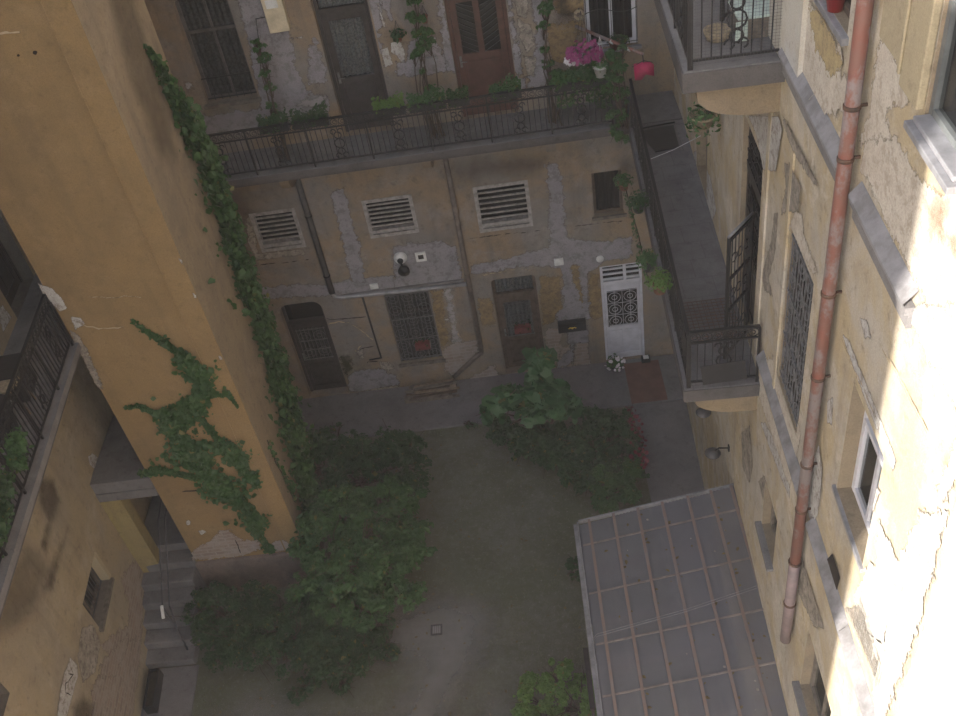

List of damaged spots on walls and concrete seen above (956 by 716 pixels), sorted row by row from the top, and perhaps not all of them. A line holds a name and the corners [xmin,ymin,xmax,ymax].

peeling [381,42,405,67]
spalling [860,41,956,411]
peeling [570,264,603,320]
peeling [38,283,103,390]
peeling [843,335,896,471]
peeling [808,445,822,519]
spalling [186,520,290,561]
peeling [798,558,824,628]
spalling [846,440,956,716]